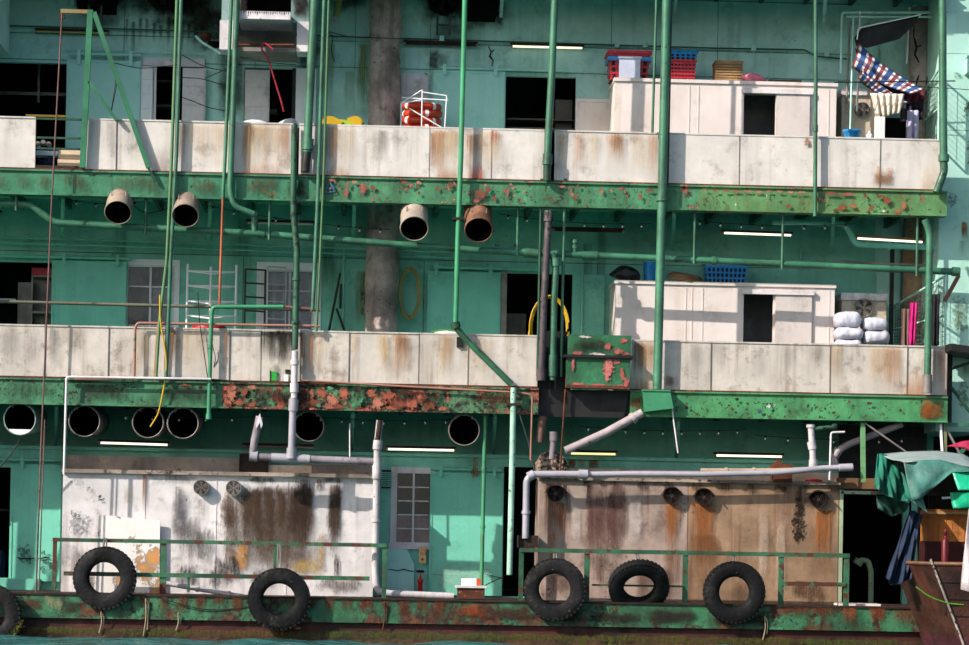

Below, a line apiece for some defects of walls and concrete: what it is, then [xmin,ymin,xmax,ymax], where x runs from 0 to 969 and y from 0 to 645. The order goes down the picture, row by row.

rust [431,131,454,156]
rust [0,167,942,195]
peeling [570,338,630,387]
rust [634,343,649,365]
rust [630,383,948,418]
leakage [173,477,340,586]
rust [545,484,570,557]
rust [586,487,626,559]
rust [665,504,678,536]
leakage [322,555,359,590]